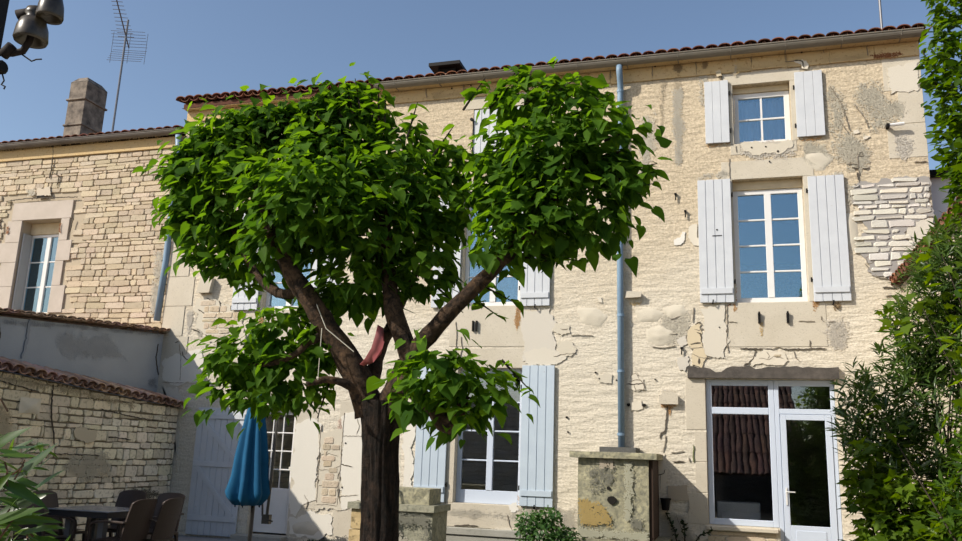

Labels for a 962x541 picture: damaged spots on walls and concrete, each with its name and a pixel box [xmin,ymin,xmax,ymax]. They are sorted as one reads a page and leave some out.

damp [739,79,915,208]
crack [829,85,869,183]
flaking render [850,176,937,279]
peeling [676,303,730,371]
crack [652,307,835,365]
crack [0,380,158,456]
peeling [288,412,362,541]